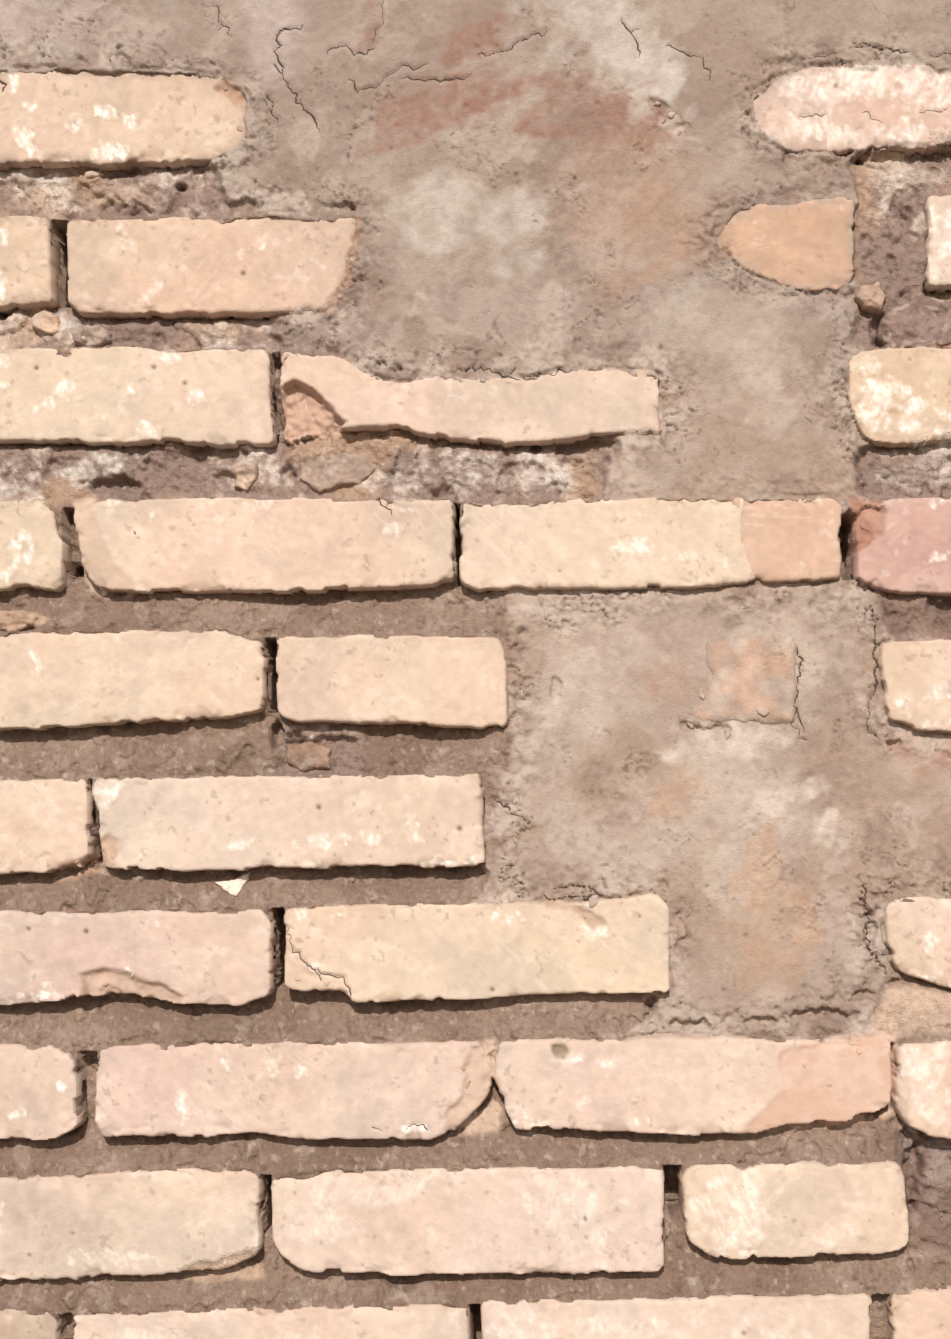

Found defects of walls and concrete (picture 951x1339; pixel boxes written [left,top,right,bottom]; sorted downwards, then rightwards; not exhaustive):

crack [264,25,321,134]
crack [327,1,547,94]
crack [622,22,711,81]
spalling [280,375,348,447]
spalling [71,493,142,601]
spalling [841,494,889,558]
peeling [215,872,250,897]
spalling [74,962,192,1004]
crack [287,928,352,1000]
spalling [284,939,355,1002]
spalling [439,1036,505,1139]
spalling [177,1241,269,1289]